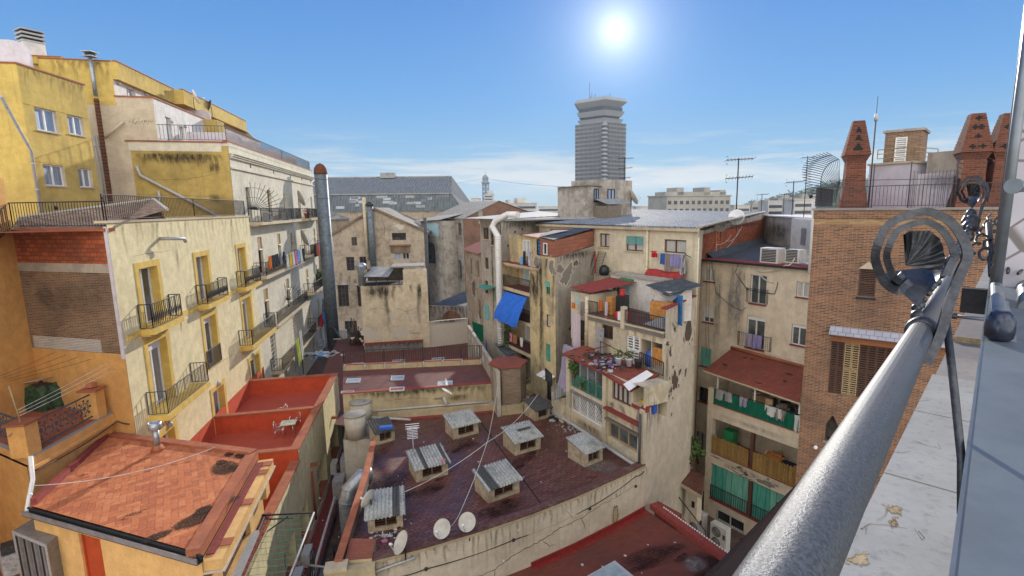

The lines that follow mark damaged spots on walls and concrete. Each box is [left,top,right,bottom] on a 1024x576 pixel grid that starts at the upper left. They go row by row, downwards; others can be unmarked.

spalling [664,320,693,417]